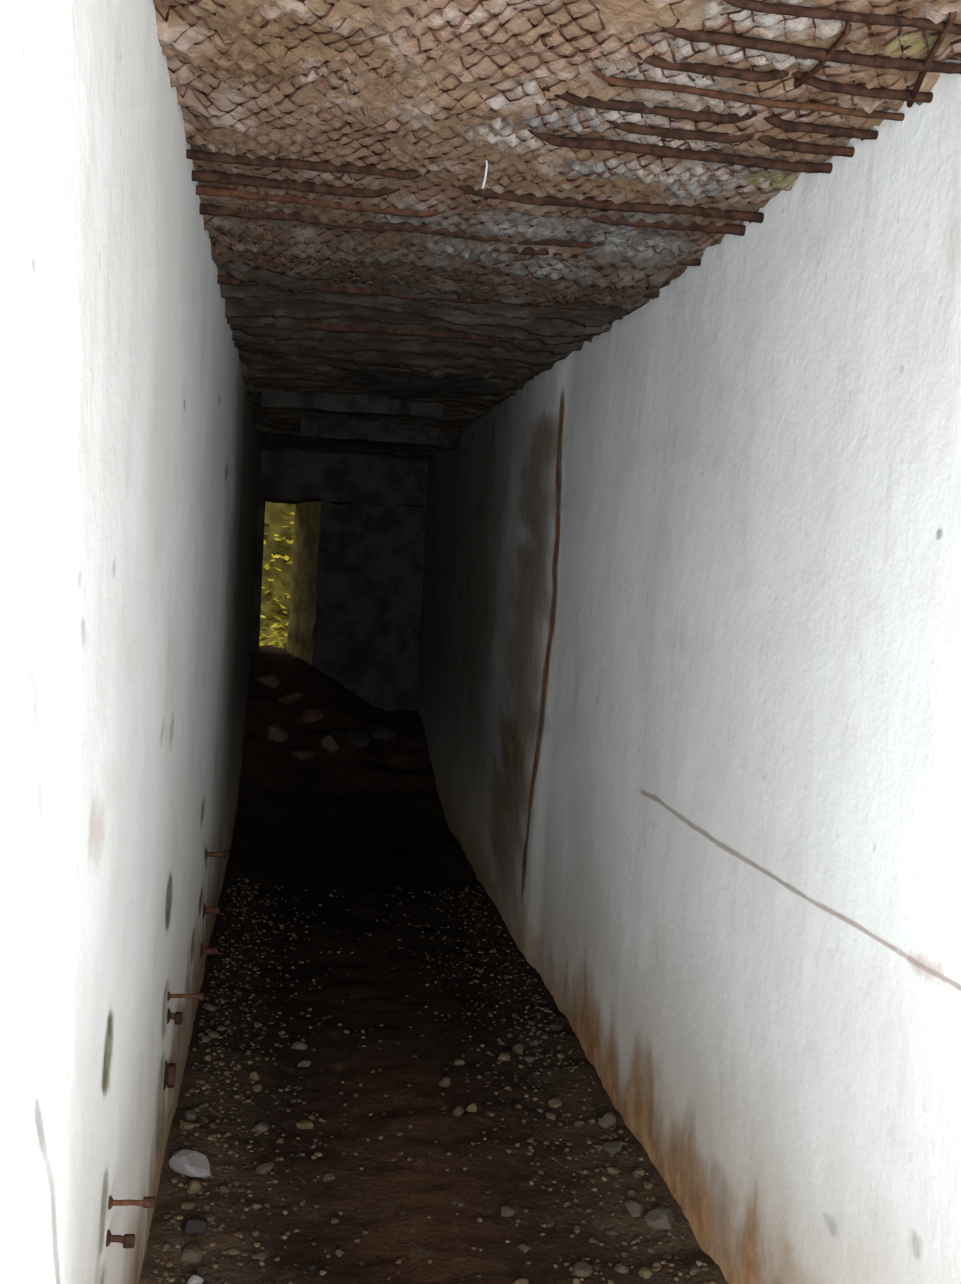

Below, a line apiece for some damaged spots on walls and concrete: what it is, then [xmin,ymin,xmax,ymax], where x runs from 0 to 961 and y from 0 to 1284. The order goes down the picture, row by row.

spalling [648,34,842,68]
spalling [698,0,845,40]
spalling [467,61,801,199]
spalling [372,212,690,286]
rust [493,394,564,896]
rust [566,981,758,1284]